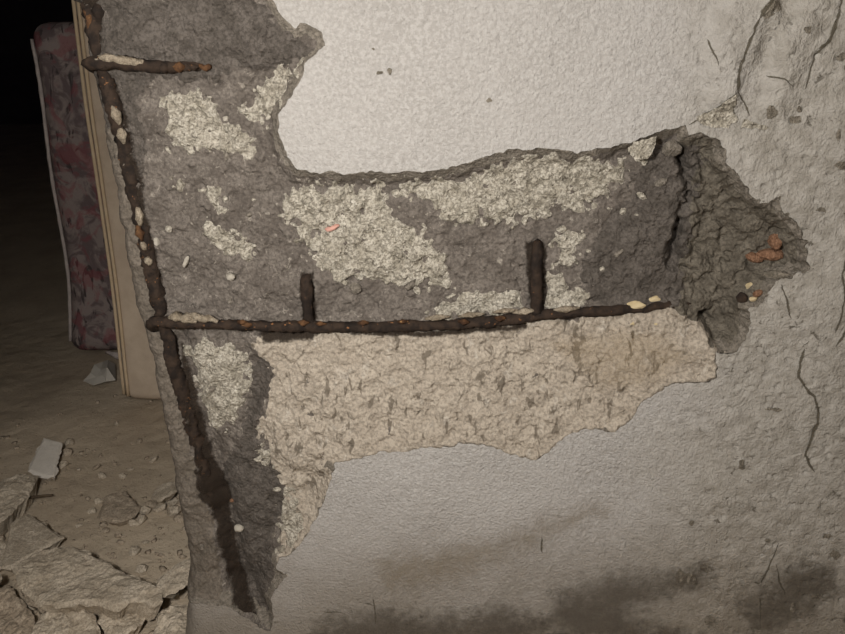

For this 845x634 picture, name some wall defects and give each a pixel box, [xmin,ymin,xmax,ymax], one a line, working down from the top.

crack [689,0,774,125]
crack [766,0,843,89]
rust [116,84,152,242]
spalling [687,132,811,278]
rust [260,272,327,343]
spalling [94,0,720,631]
rust [351,315,527,337]
spalling [710,276,781,353]
crack [797,341,820,472]
water stain [321,610,543,634]
water stain [557,580,664,634]
water stain [745,567,835,627]